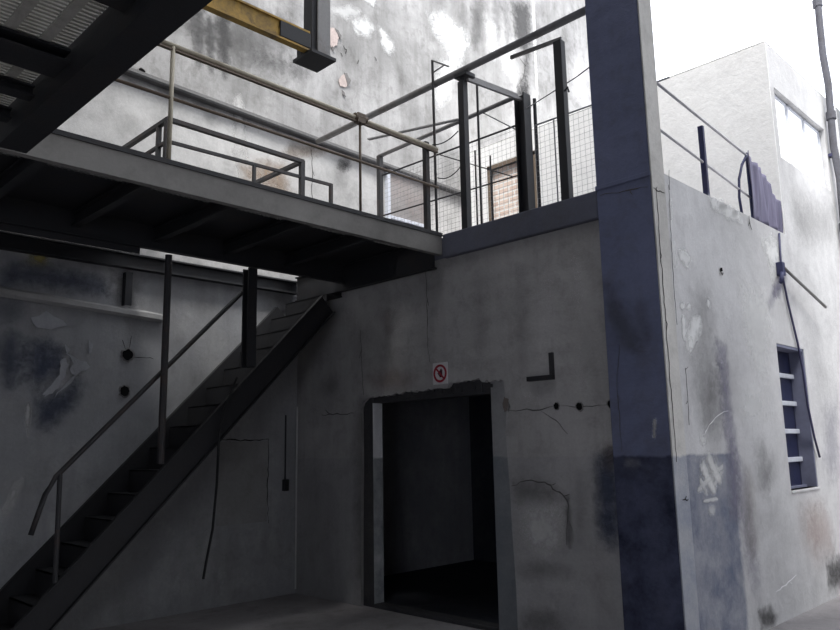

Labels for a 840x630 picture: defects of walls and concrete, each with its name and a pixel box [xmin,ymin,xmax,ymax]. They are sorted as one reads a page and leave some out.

leakage [193,12,229,73]
flaking render [330,28,342,51]
leakage [514,1,538,105]
flaking render [339,73,351,97]
peeling [680,303,701,351]
peeling [43,340,93,397]
peeling [699,455,721,502]
crack [512,479,573,545]